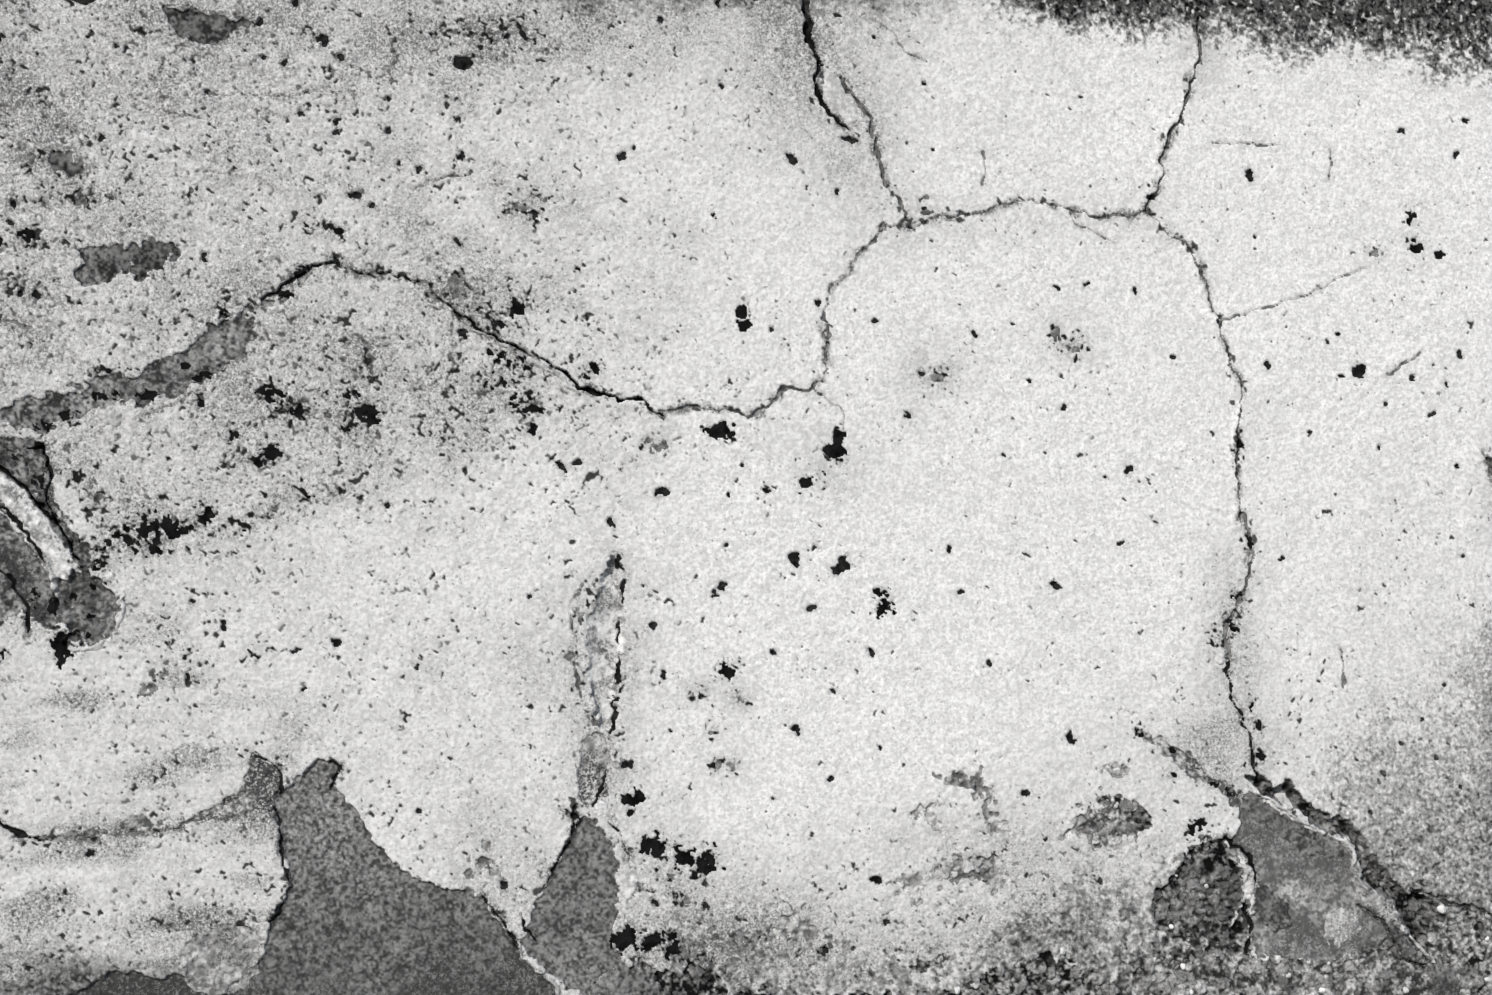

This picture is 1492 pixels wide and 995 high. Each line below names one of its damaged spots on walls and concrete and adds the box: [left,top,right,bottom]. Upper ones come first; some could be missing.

damp [633,0,930,14]
crack [801,0,994,256]
crack [1032,17,1202,240]
crack [1212,140,1274,148]
damp [1001,0,1492,85]
crack [261,258,832,419]
peeling [0,269,314,653]
hole [563,554,645,734]
crack [1175,238,1492,968]
peeling [69,757,772,995]
spalling [769,903,829,957]
spalling [835,729,1492,995]